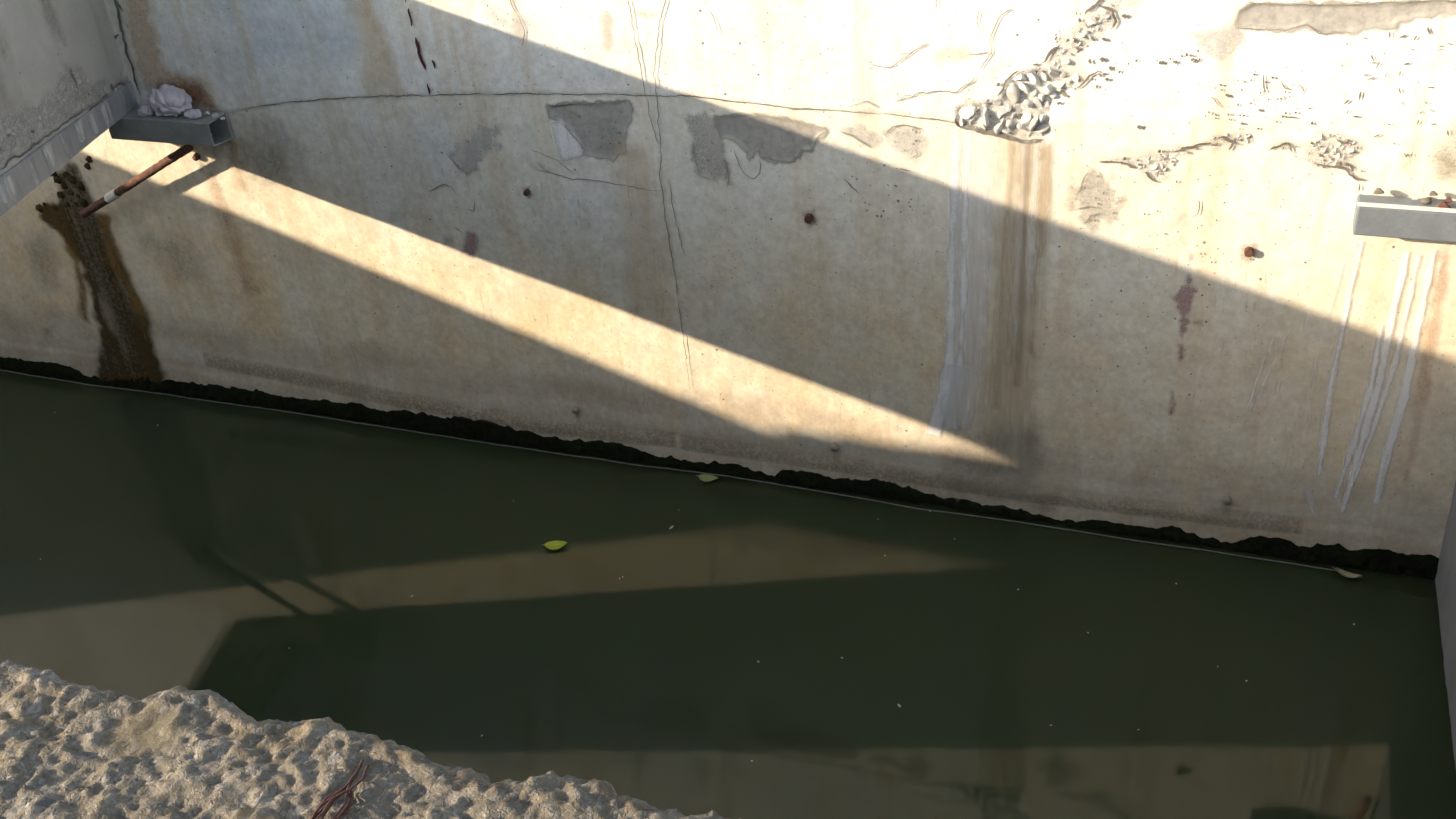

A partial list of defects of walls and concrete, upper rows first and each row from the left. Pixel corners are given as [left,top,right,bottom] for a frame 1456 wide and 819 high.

corrosion [80,144,193,218]
spalling [546,100,633,162]
crack [238,0,1015,389]
spalling [687,108,921,218]
spalling [985,12,1138,143]
spalling [1121,74,1363,183]
peeling [1234,0,1456,118]
damp [926,130,1048,470]
damp [1317,242,1363,476]
damp [1333,252,1442,513]